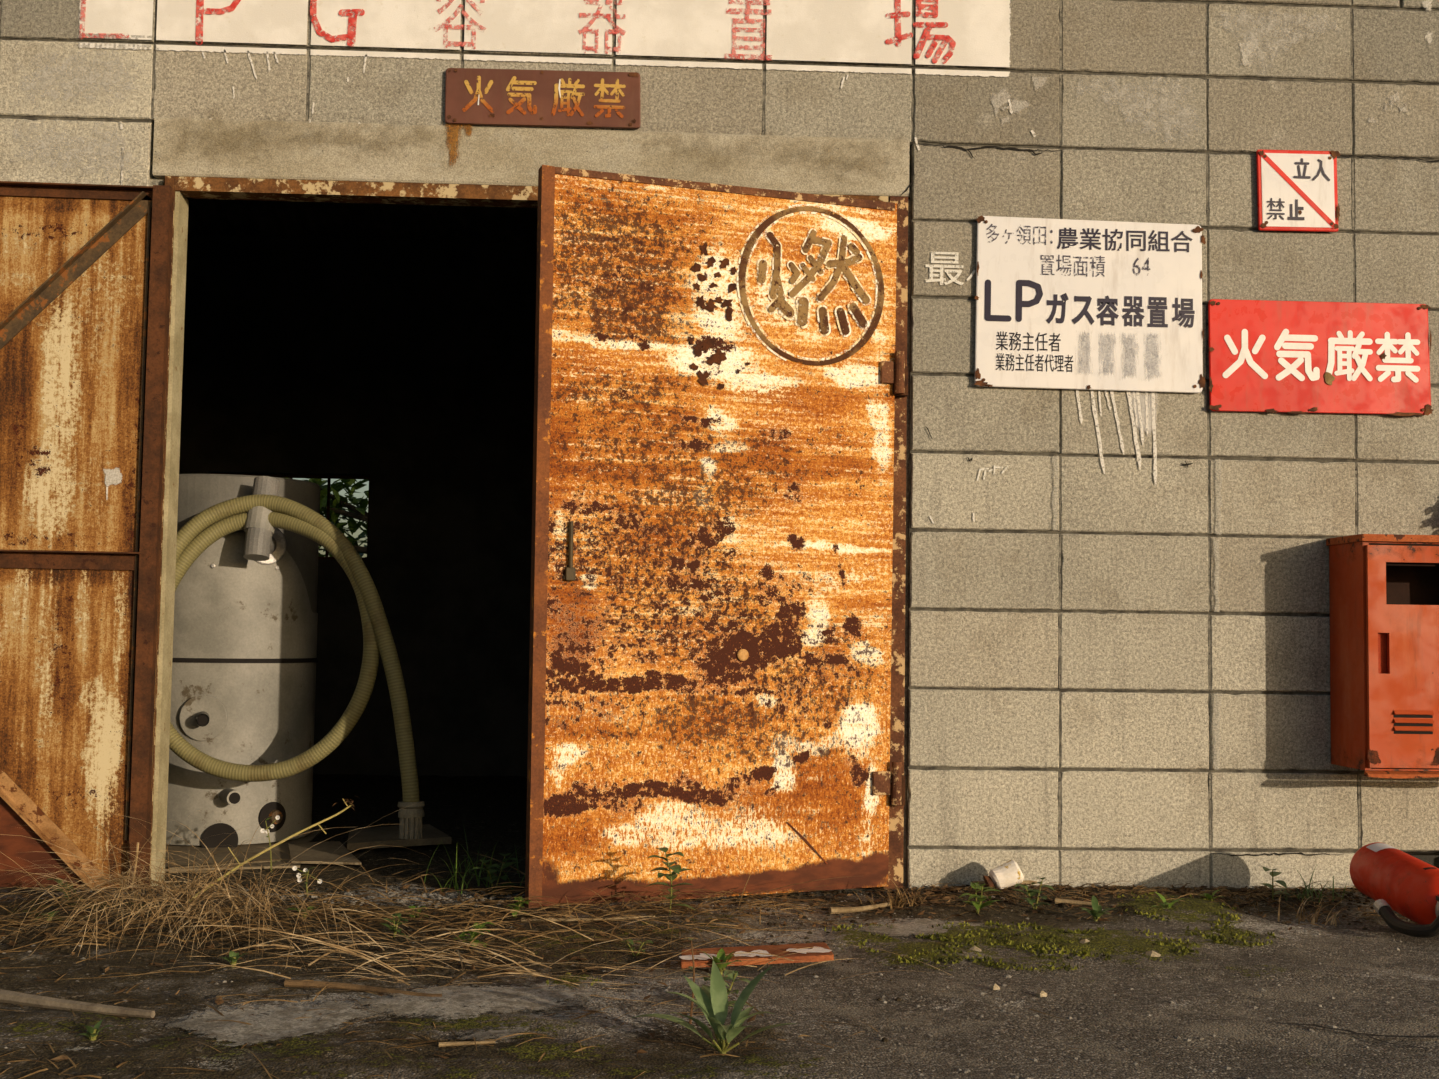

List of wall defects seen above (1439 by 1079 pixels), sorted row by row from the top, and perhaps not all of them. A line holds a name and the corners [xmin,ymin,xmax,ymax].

corrosion [446,124,472,165]
leakage [1076,390,1157,486]